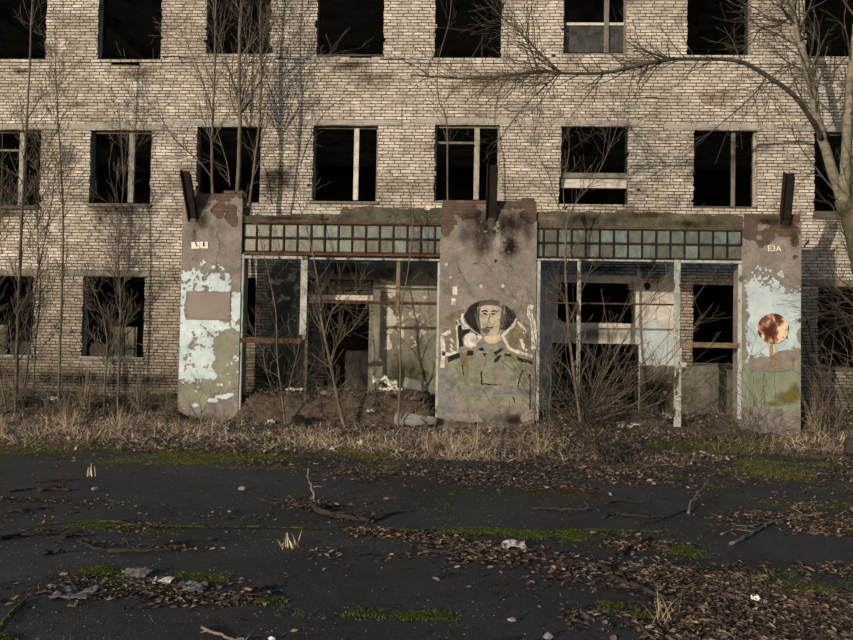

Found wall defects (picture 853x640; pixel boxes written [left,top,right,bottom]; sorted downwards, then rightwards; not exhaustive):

spalling [194,193,242,227]
spalling [442,200,486,237]
water stain [475,213,524,254]
spalling [497,201,537,225]
spalling [744,213,809,260]
peeling [178,259,241,410]
peeling [380,277,428,350]
peeling [742,265,801,412]